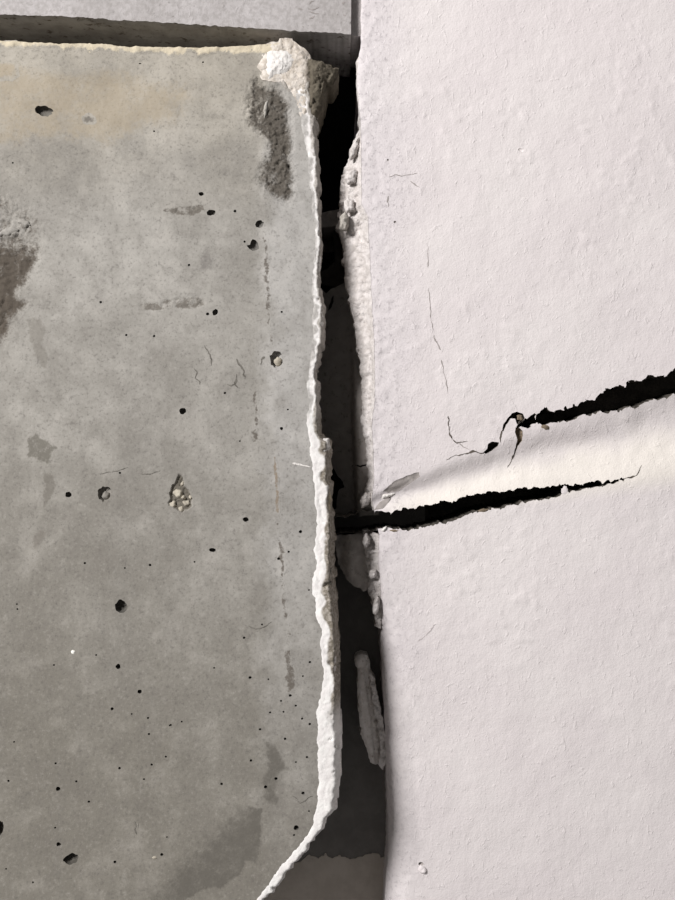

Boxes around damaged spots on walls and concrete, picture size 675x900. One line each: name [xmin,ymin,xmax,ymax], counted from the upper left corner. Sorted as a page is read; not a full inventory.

crack [428,290,448,391]
crack [447,368,675,466]
spalling [0,38,386,900]
crack [334,465,642,534]